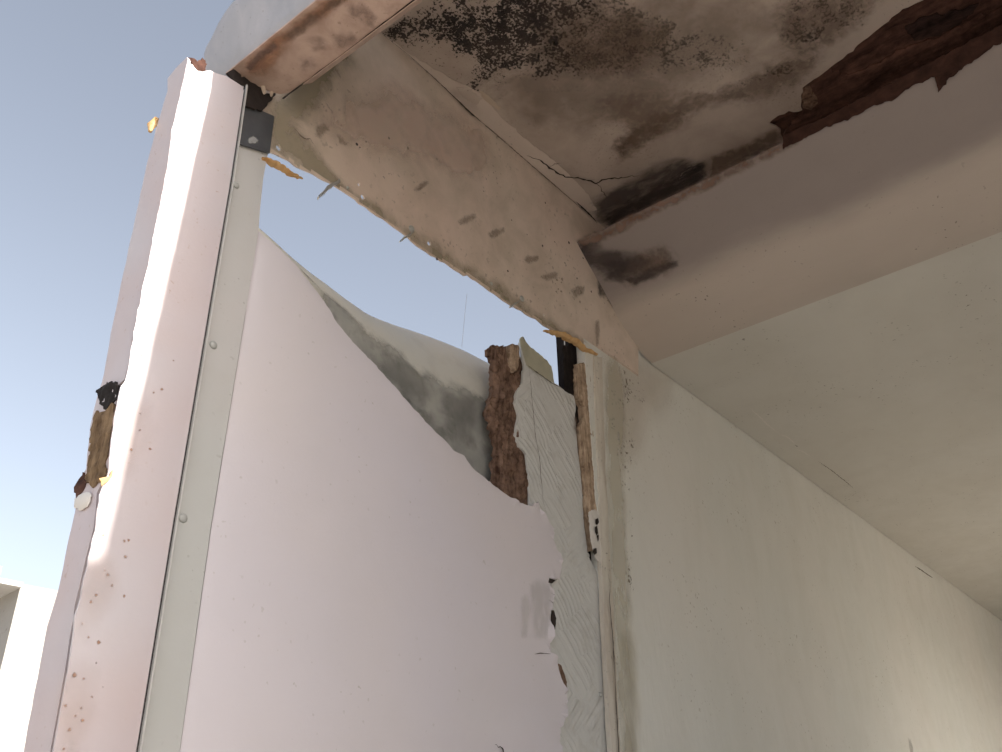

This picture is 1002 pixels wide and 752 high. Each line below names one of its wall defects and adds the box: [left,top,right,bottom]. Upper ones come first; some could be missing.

crack [282,0,634,221]
leakage [383,0,743,91]
leakage [782,0,864,45]
peeling [782,24,1002,149]
leakage [597,131,779,225]
leakage [580,244,676,295]
leakage [325,295,493,481]
peeling [519,337,554,383]
peeling [74,381,120,511]
peeling [588,510,601,562]